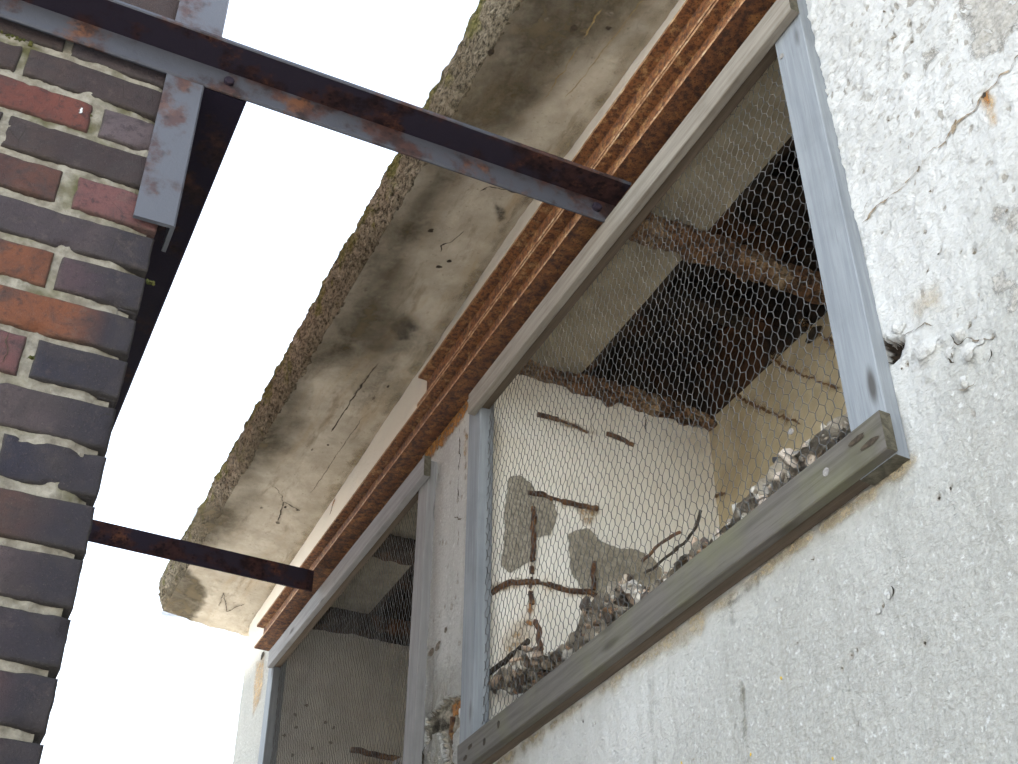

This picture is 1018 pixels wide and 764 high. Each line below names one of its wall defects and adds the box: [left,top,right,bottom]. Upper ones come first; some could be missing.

leakage [443,0,639,129]
crack [862,55,1018,223]
leakage [311,168,454,365]
hole [883,329,914,370]
rust [424,401,468,457]
rust [520,359,718,434]
rust [606,431,634,447]
leakage [190,506,236,541]
flaking render [501,475,558,572]
flaking render [568,528,662,593]
leakage [160,571,205,621]
spalling [422,697,461,764]